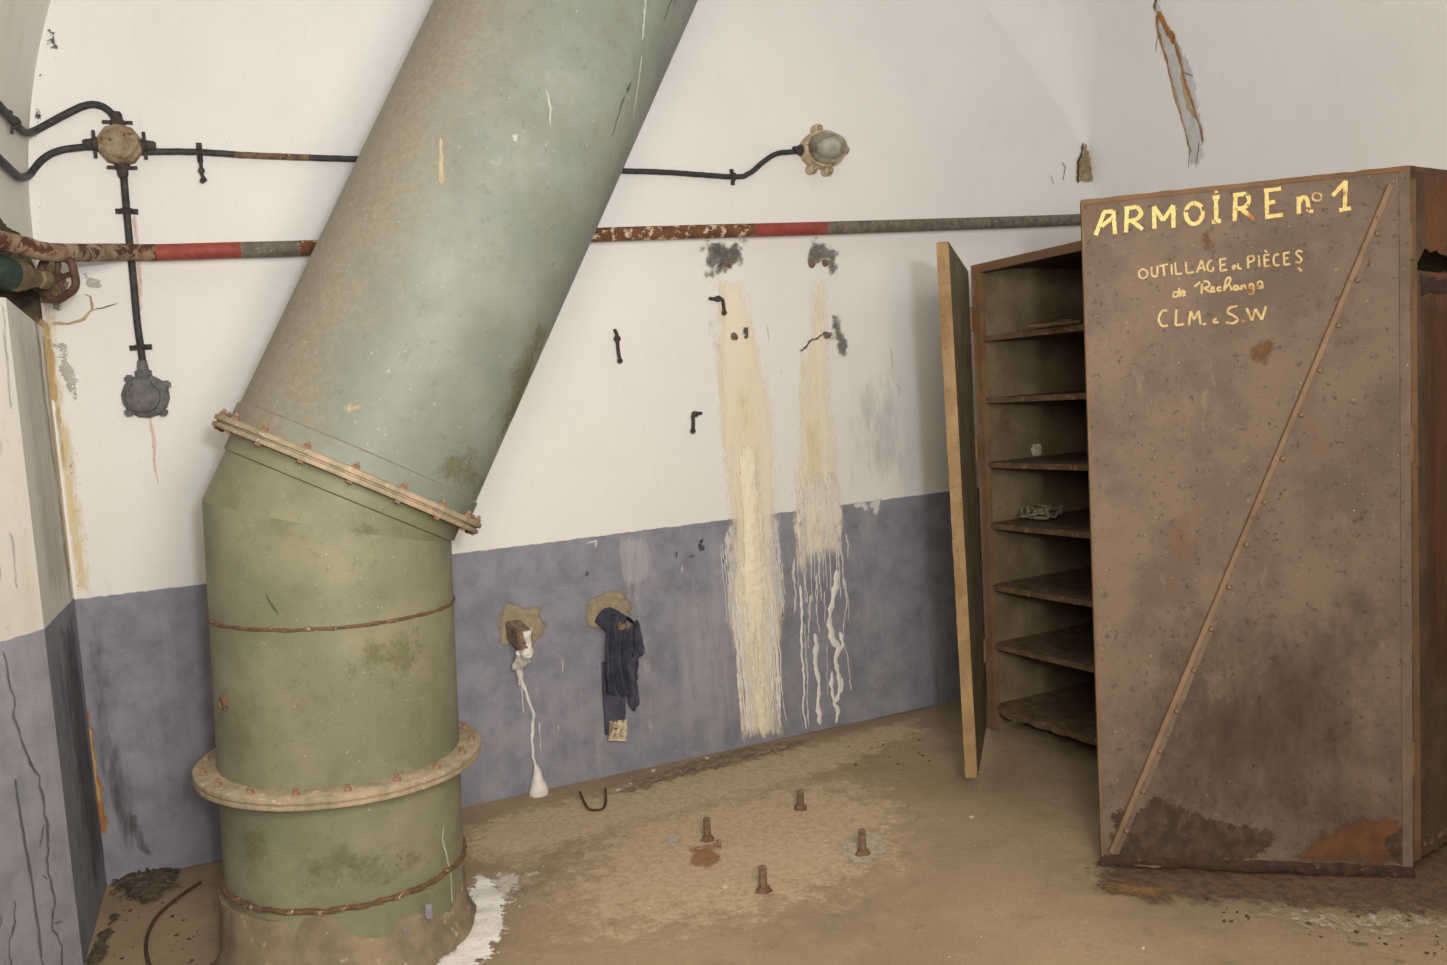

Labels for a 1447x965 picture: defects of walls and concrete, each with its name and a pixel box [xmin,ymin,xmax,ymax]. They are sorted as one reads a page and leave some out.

crack [1153,0,1203,167]
water stain [463,240,943,943]
crack [1,652,63,965]
corrosion [86,706,108,833]
corrosion [692,849,720,867]
water stain [1260,904,1447,943]